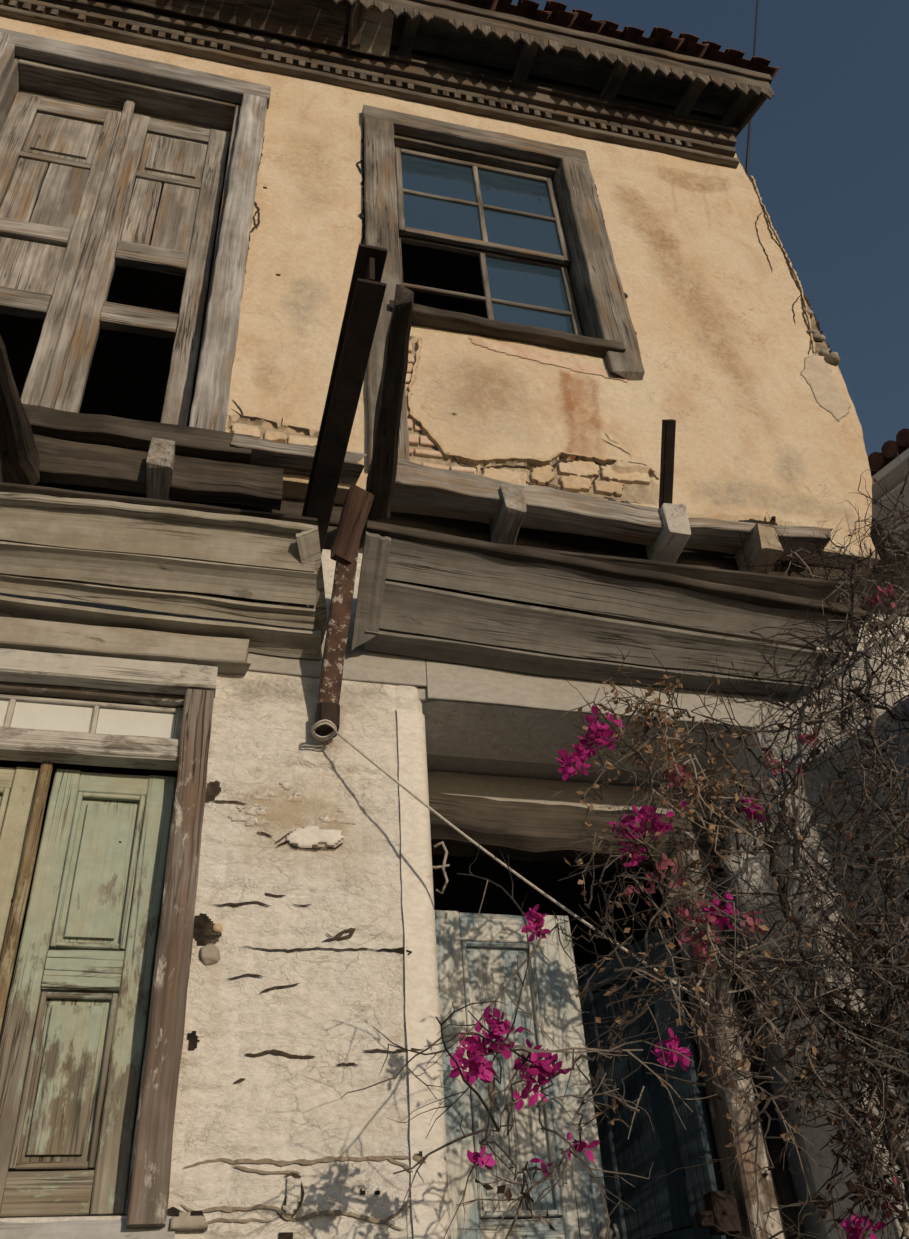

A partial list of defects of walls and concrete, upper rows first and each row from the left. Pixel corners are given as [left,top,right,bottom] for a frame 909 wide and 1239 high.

crack [755,200,812,354]
spalling [405,336,659,505]
peeling [229,780,356,850]
crack [213,893,311,906]
spalling [193,913,222,966]
crack [227,928,412,994]
crack [234,1048,423,1083]
crack [167,1166,304,1224]
crack [382,1155,426,1224]